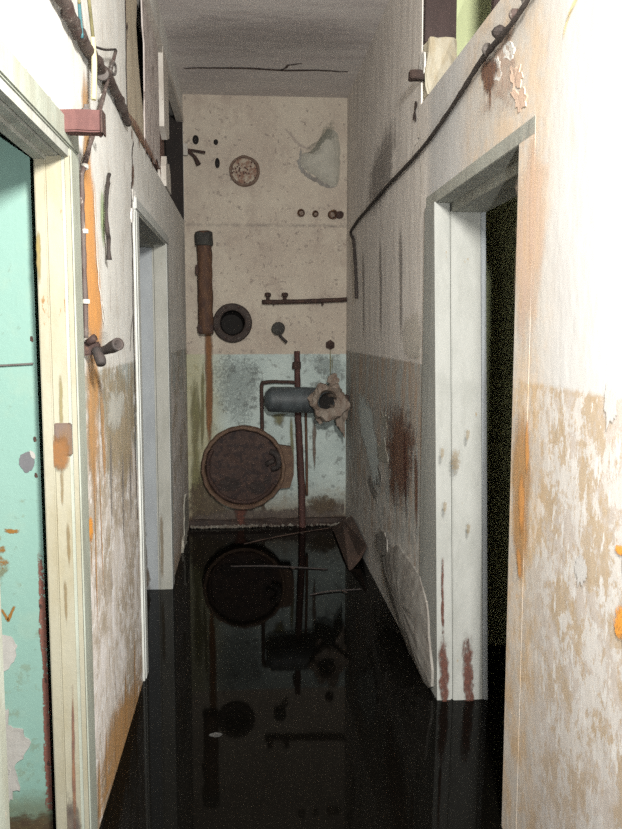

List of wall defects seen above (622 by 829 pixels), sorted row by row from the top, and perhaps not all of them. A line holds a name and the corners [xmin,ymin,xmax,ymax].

crack [184,63,348,72]
damp [104,371,134,524]
damp [190,388,344,520]
corrosion [386,409,418,521]
peeling [2,635,17,671]
peeling [38,559,56,811]
corrosion [439,559,449,702]
corrosion [462,639,474,701]
peeling [5,708,31,802]